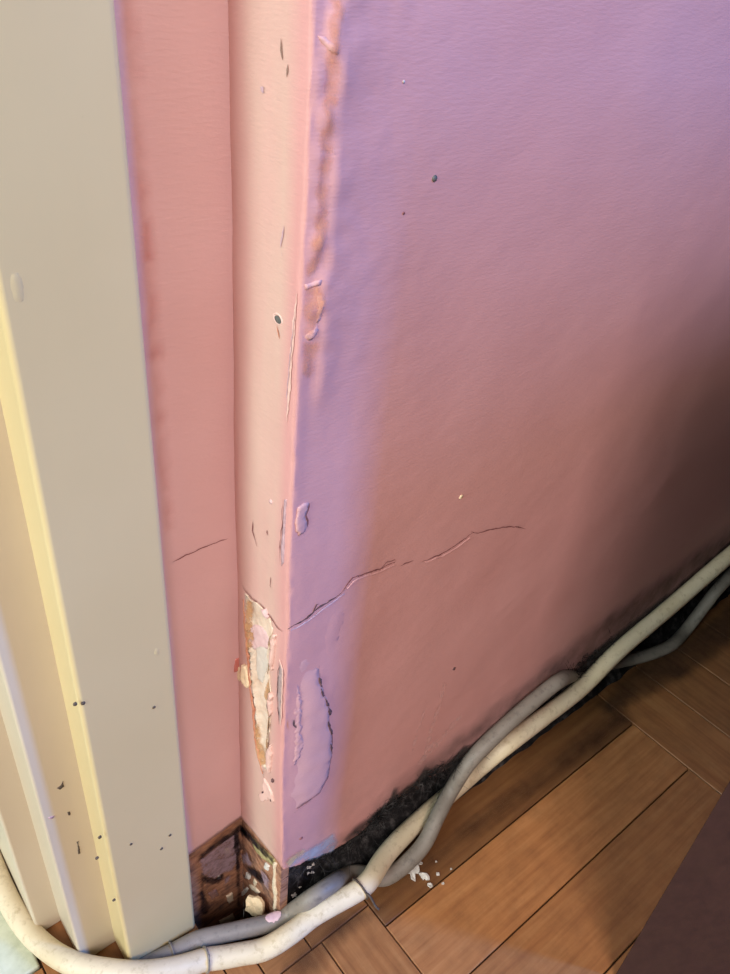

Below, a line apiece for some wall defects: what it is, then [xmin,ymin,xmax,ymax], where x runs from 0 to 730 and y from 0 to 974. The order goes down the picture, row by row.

peeling [269,499,310,566]
crack [245,526,524,631]
water stain [576,542,730,672]
peeling [234,593,333,809]
water stain [605,607,730,725]
water stain [347,747,470,840]
water stain [288,835,334,865]
peeling [245,895,265,916]